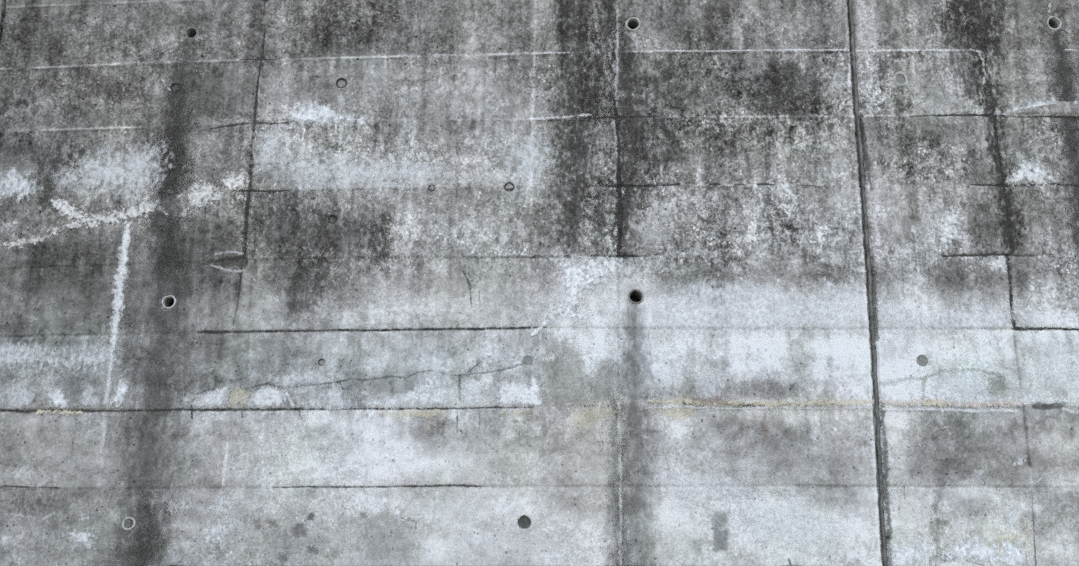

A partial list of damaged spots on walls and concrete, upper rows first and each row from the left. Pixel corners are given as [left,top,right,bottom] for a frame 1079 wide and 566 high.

damp [954,0,1059,273]
damp [0,169,35,201]
damp [72,148,171,199]
damp [487,0,811,354]
damp [932,208,964,251]
damp [650,278,866,335]
damp [885,225,1009,334]
damp [70,529,91,546]